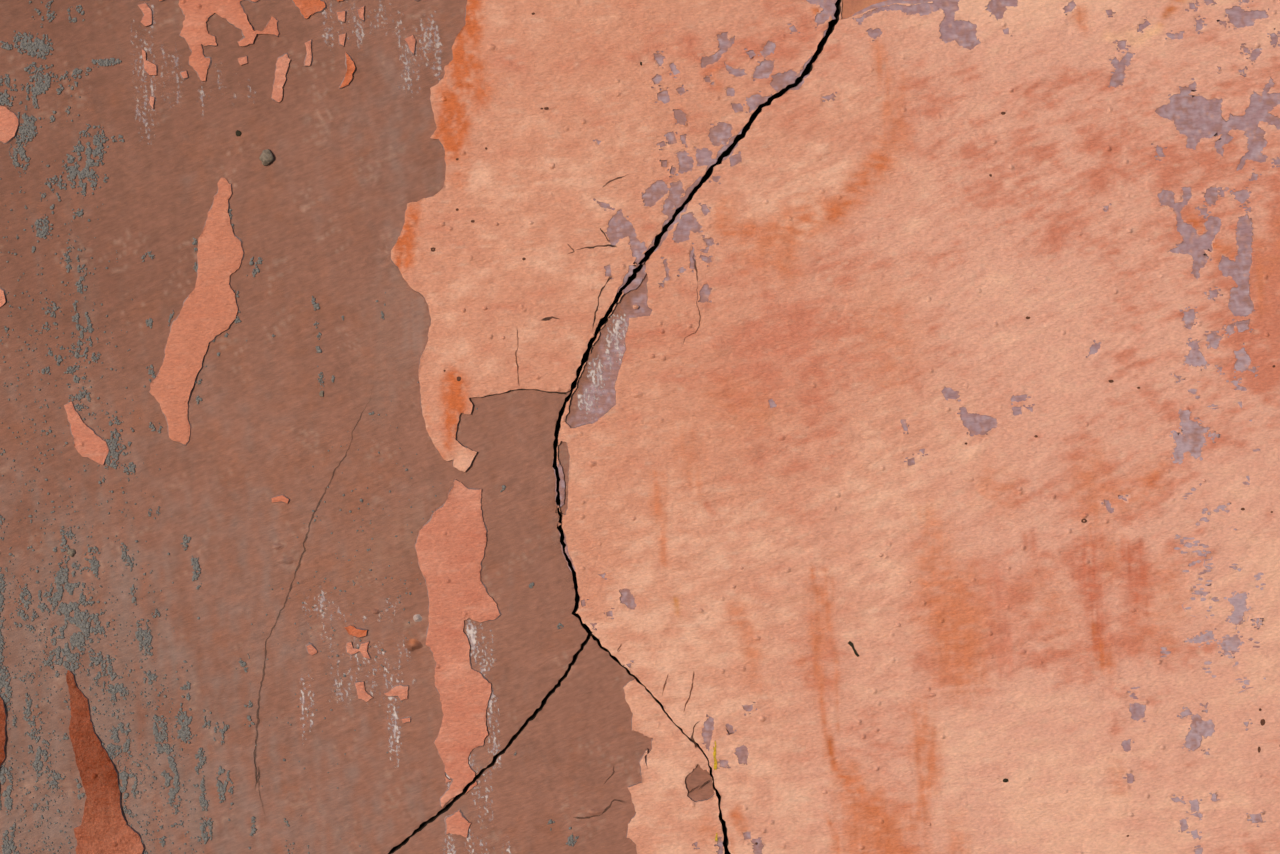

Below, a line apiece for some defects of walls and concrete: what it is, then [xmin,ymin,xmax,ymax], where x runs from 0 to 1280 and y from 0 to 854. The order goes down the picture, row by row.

peeling [985,0,1018,34]
peeling [1108,17,1150,88]
peeling [1165,0,1280,77]
peeling [1155,78,1280,464]
peeling [0,0,980,854]
crack [388,0,841,854]
peeling [942,387,997,445]
peeling [1011,394,1035,416]